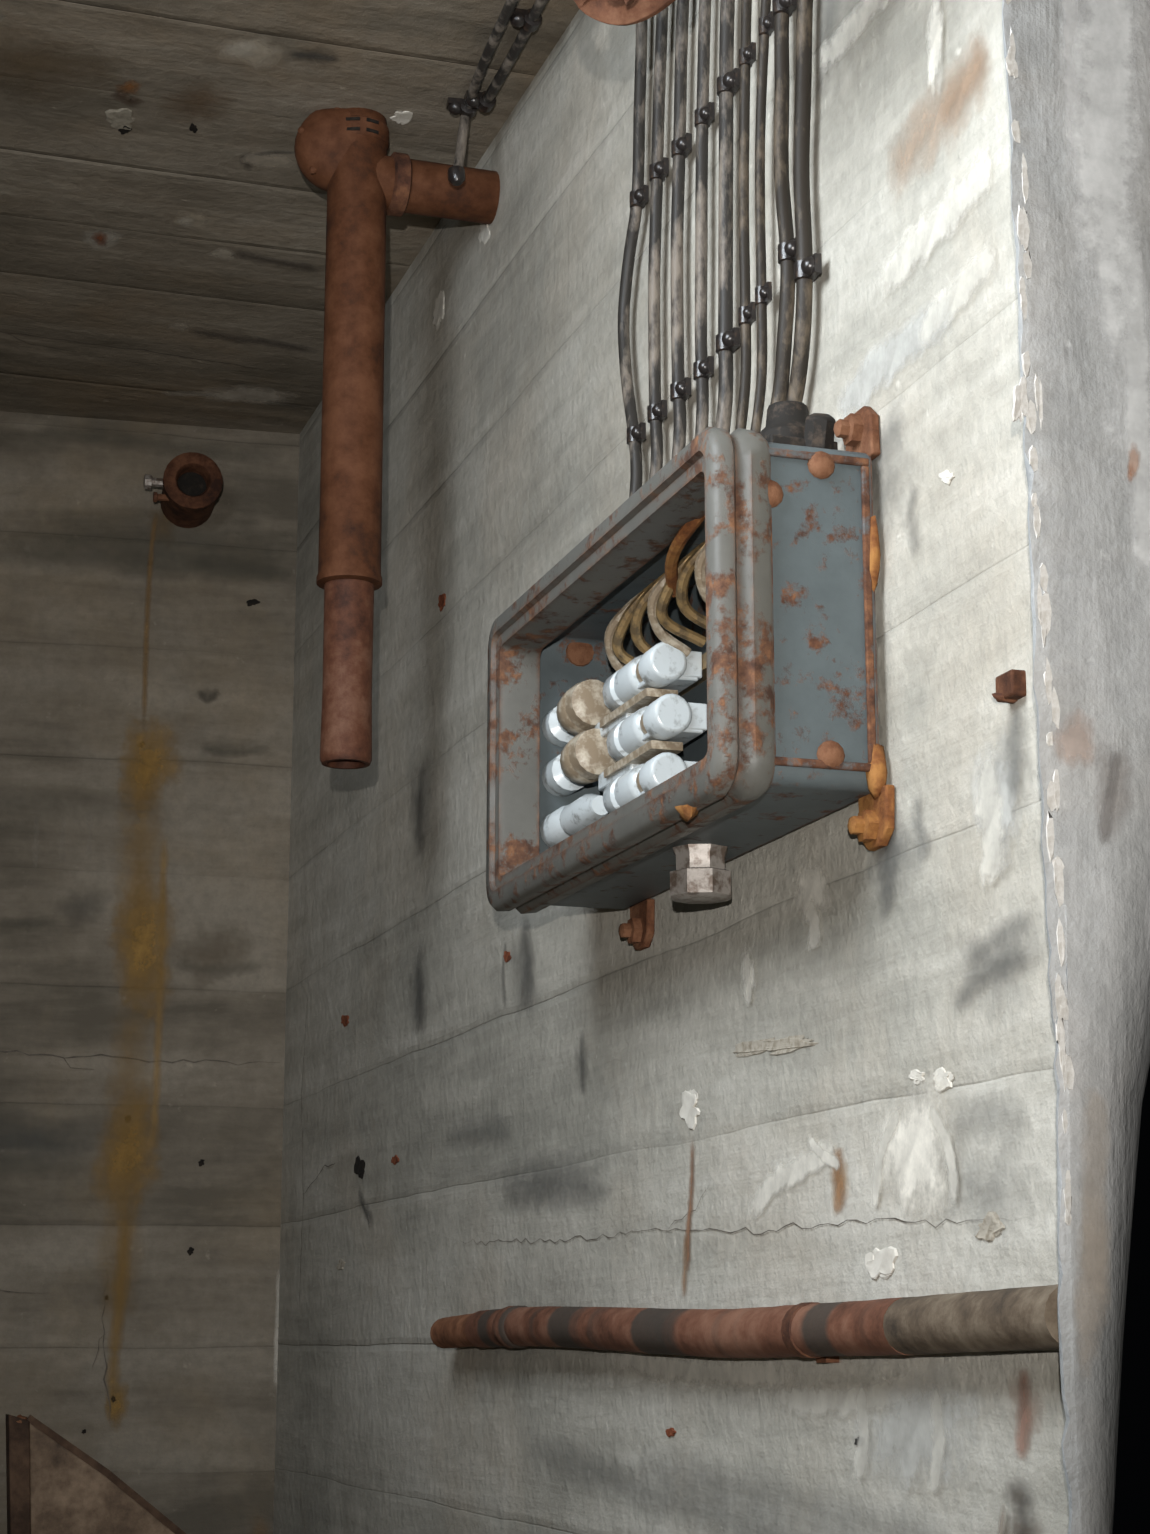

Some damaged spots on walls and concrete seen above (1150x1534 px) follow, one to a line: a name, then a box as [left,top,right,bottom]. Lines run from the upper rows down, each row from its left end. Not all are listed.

rust [683,1149,693,1290]